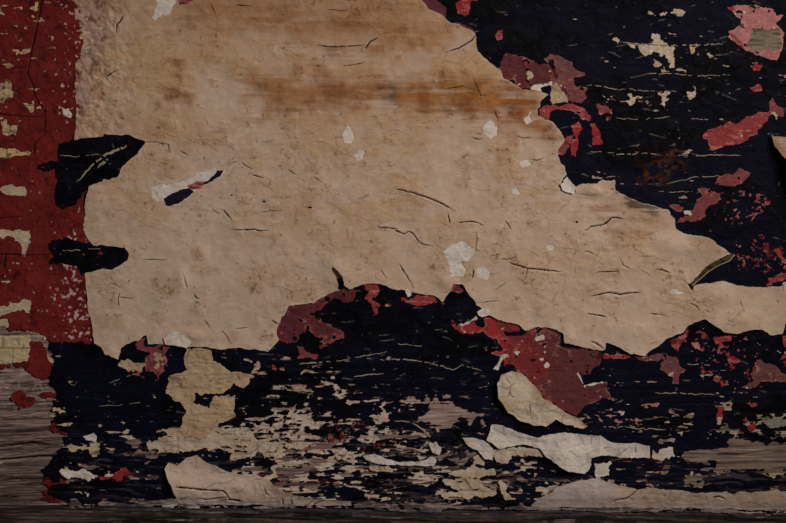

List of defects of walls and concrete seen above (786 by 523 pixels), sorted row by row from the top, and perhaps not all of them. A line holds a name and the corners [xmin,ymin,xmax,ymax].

peeling [2,48,31,68]
crack [0,0,64,151]
peeling [0,78,15,105]
peeling [1,119,18,136]
peeling [0,148,31,159]
peeling [343,125,354,143]
peeling [422,0,786,294]
peeling [37,134,145,209]
peeling [0,184,28,196]
peeling [0,228,32,256]
peeling [0,237,786,514]